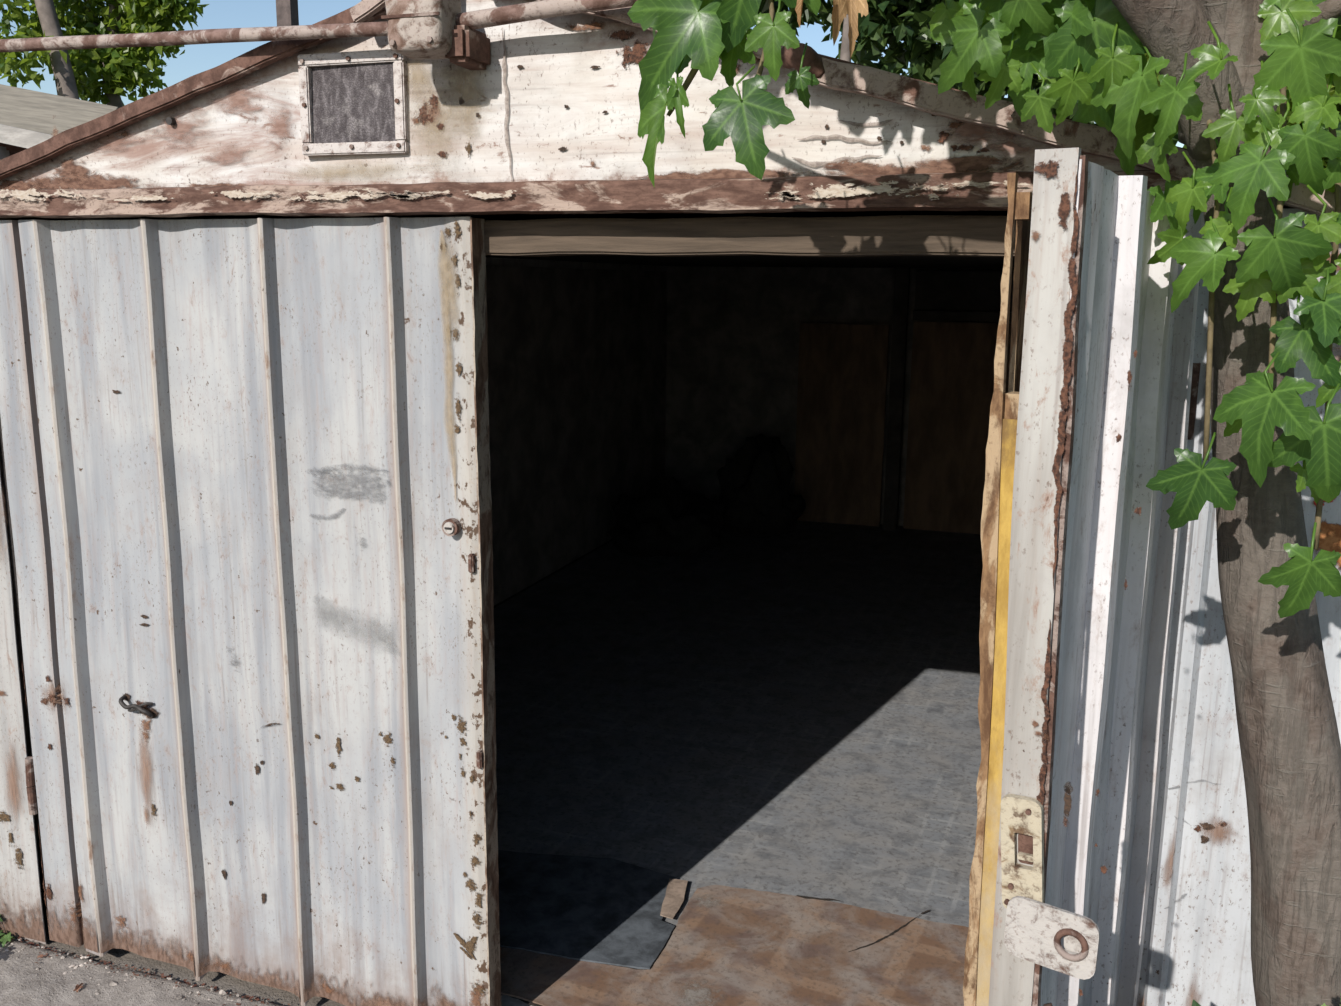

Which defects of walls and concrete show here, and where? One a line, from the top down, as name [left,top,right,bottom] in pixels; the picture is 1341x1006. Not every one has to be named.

rust [566,21,648,69]
peeling [0,187,173,202]
peeling [209,188,516,201]
peeling [766,180,1030,201]
rust [813,114,1089,903]
rust [1312,521,1341,569]
rust [122,693,159,821]
rust [0,825,485,1006]
rust [1032,964,1042,1006]